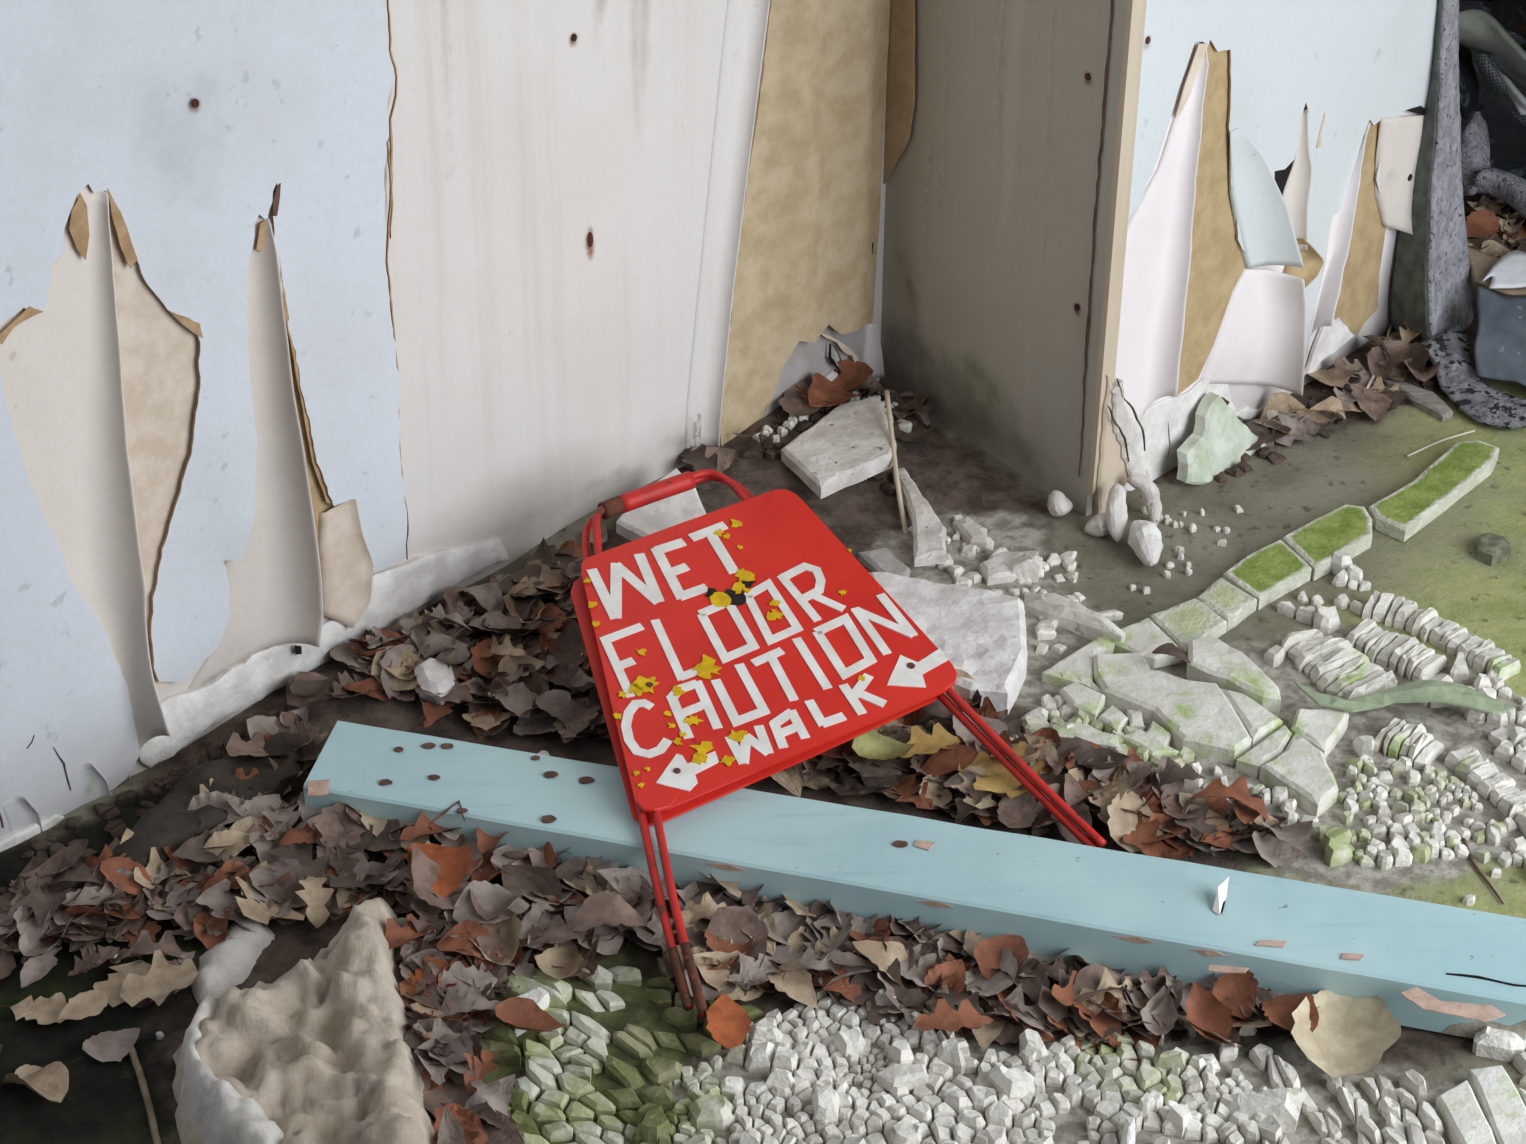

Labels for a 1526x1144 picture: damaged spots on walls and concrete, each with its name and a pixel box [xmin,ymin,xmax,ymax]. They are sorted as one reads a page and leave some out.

peeling [1092,41,1425,515]
flaking render [764,322,885,417]
peeling [0,183,509,779]
peeling [0,796,65,852]
peeling [78,763,112,807]